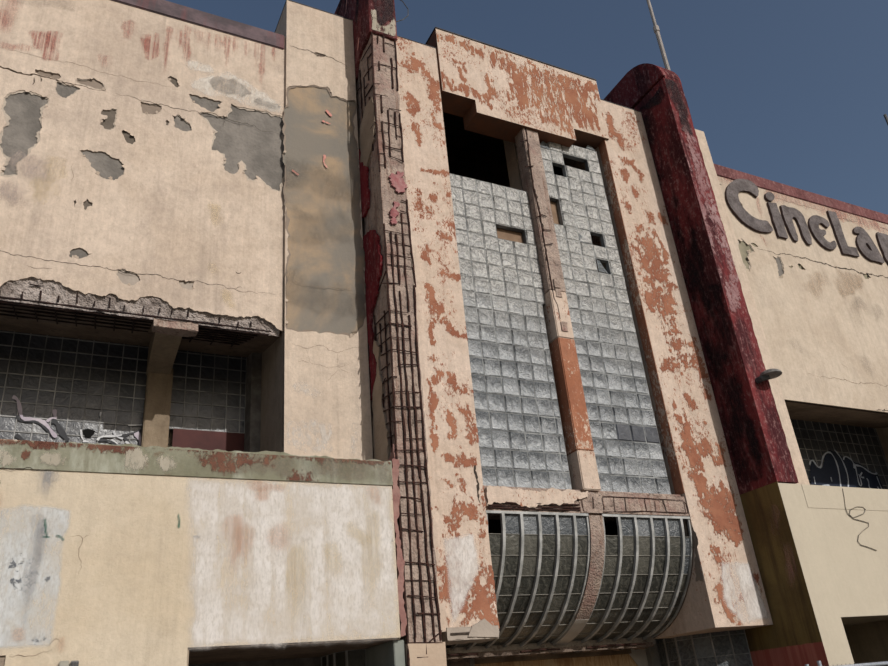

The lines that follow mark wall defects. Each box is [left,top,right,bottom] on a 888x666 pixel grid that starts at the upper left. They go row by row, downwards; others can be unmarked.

leakage [374,0,394,25]
crack [2,47,278,134]
crack [761,249,888,278]
spalling [0,9,689,666]
leakage [666,198,762,483]
peeling [630,210,744,568]
rust [0,439,139,460]
rust [170,449,391,481]
peeling [692,527,743,626]